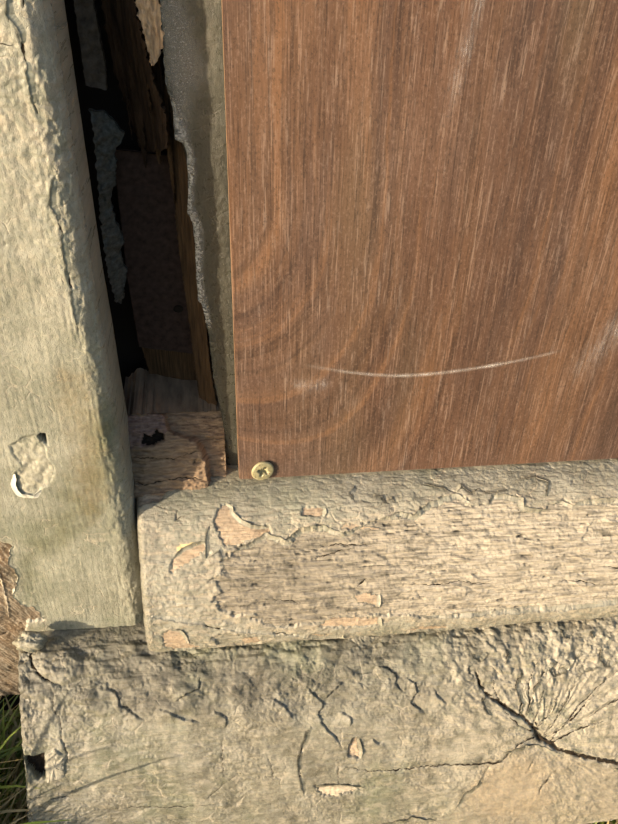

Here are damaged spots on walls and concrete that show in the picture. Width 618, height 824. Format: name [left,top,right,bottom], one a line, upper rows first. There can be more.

crack [0,0,38,114]
peeling [11,433,54,498]
peeling [170,541,206,573]
peeling [208,493,618,639]
peeling [0,541,45,696]
peeling [162,630,199,649]
crack [337,630,618,778]
peeling [46,749,65,783]
crack [298,726,313,793]